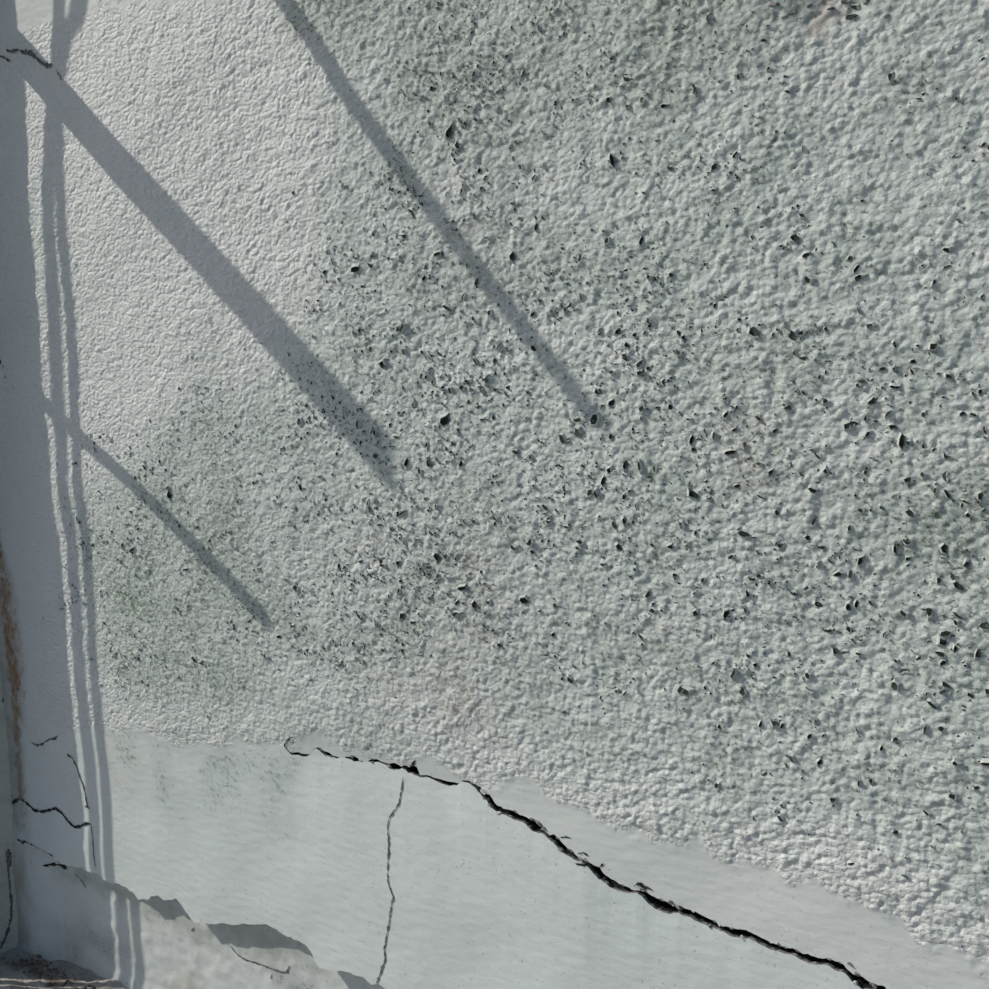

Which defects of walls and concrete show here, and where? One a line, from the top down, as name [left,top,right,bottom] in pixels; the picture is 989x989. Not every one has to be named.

water stain [285,0,382,59]
water stain [386,0,768,138]
water stain [806,0,869,33]
water stain [82,430,282,742]
crack [0,735,96,949]
crack [284,737,886,989]
crack [230,946,290,979]